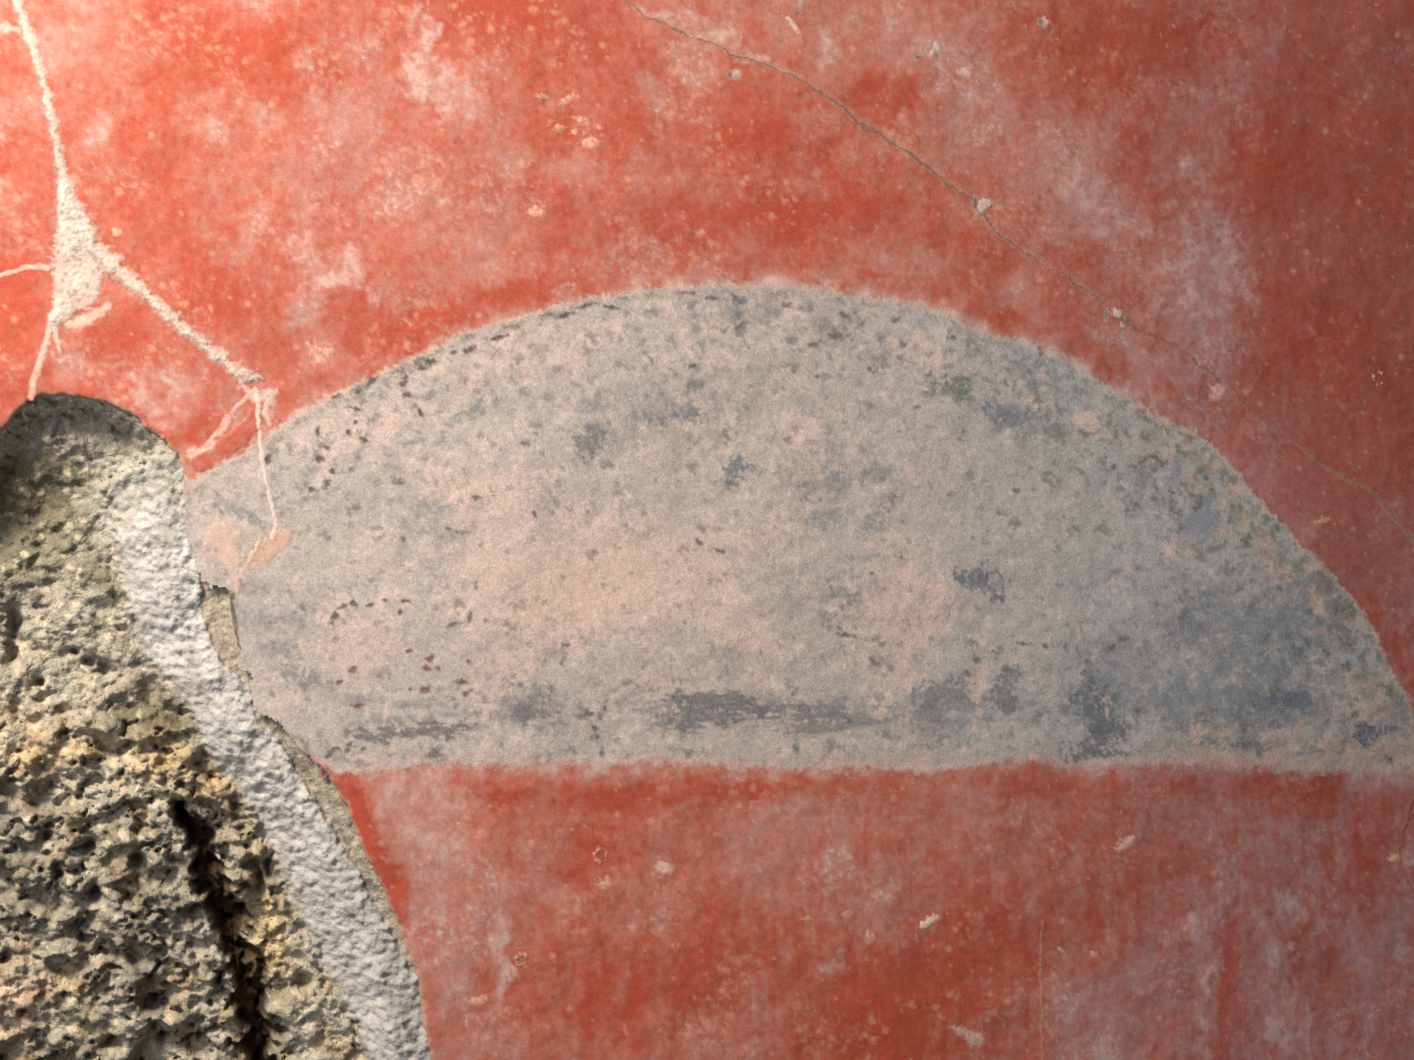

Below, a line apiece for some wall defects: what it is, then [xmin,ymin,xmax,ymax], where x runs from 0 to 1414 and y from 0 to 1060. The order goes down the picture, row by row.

crack [0,0,280,651]
crack [621,0,1414,545]
peeling [0,278,1414,1060]